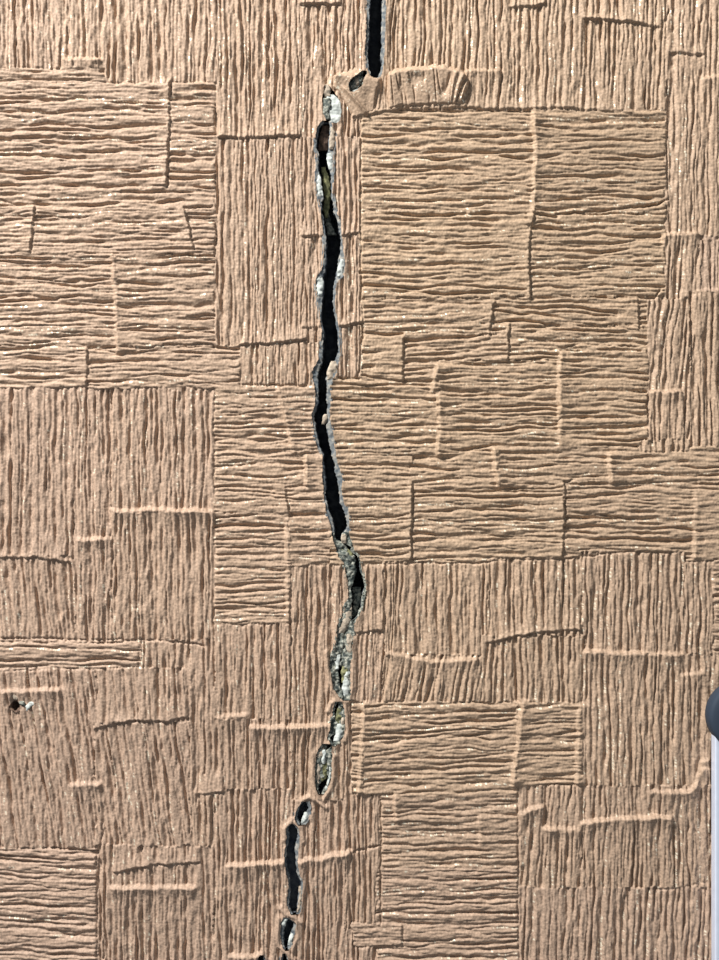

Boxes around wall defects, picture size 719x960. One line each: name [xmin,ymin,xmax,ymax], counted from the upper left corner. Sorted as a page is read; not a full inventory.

crack [349,0,387,92]
crack [257,121,368,960]